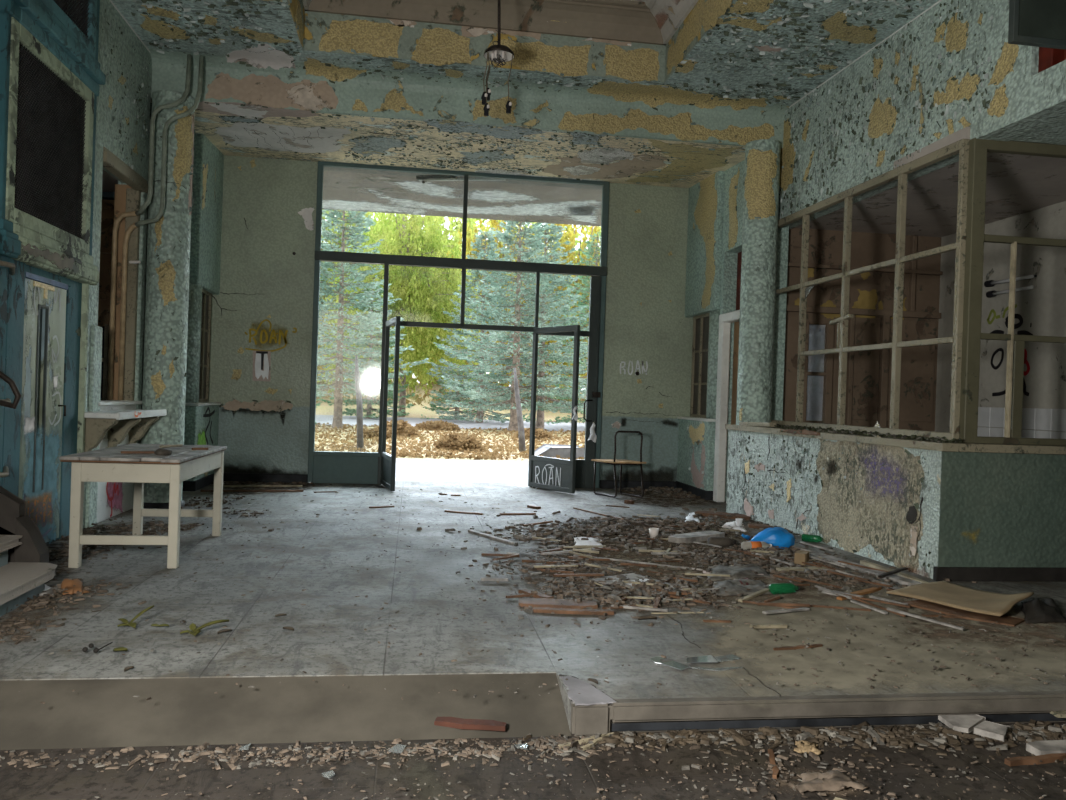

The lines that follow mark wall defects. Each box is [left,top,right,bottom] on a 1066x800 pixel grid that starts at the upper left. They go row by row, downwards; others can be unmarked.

peeling [102,0,1019,309]
peeling [149,324,186,399]
peeling [739,428,931,573]